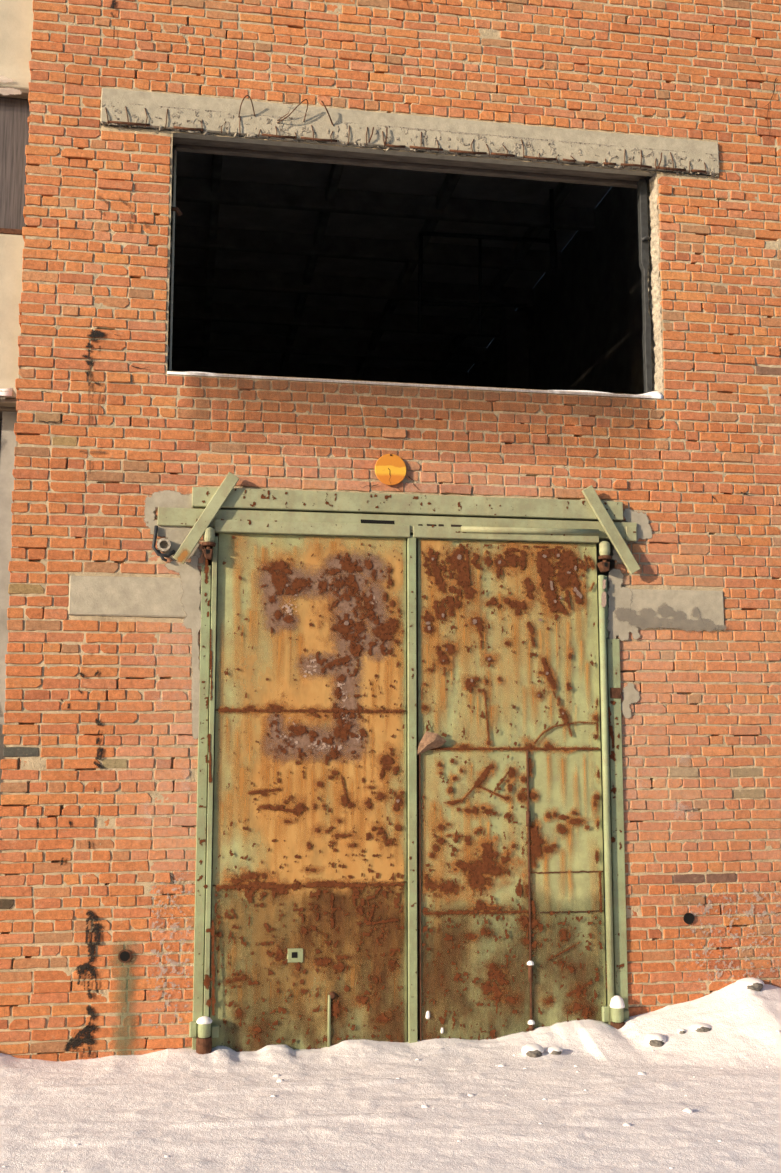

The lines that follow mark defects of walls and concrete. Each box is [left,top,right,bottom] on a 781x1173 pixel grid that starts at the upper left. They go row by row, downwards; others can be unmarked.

spalling [101,102,719,177]
rust [197,495,624,1052]